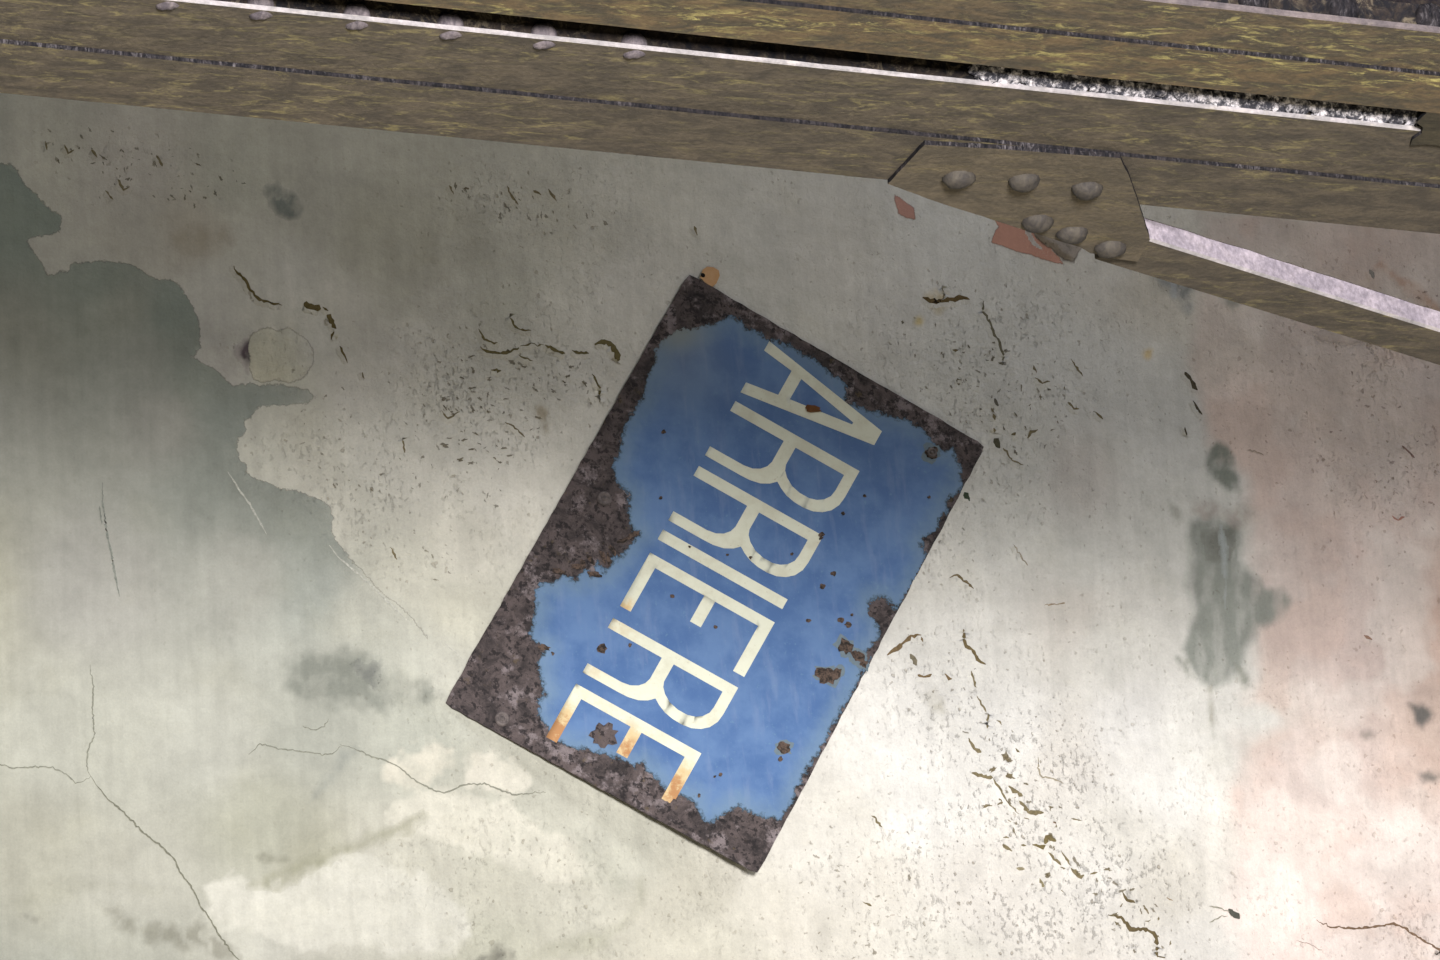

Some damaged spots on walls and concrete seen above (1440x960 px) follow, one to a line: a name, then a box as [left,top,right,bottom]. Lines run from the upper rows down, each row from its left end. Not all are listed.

damp [262,180,305,221]
flaking render [992,221,1081,265]
peeling [0,93,587,637]
damp [1165,437,1296,740]
damp [278,641,443,721]
crack [0,667,239,960]
crack [248,721,546,796]
peeling [379,733,583,892]
peeling [201,851,475,960]
crack [1295,920,1440,958]